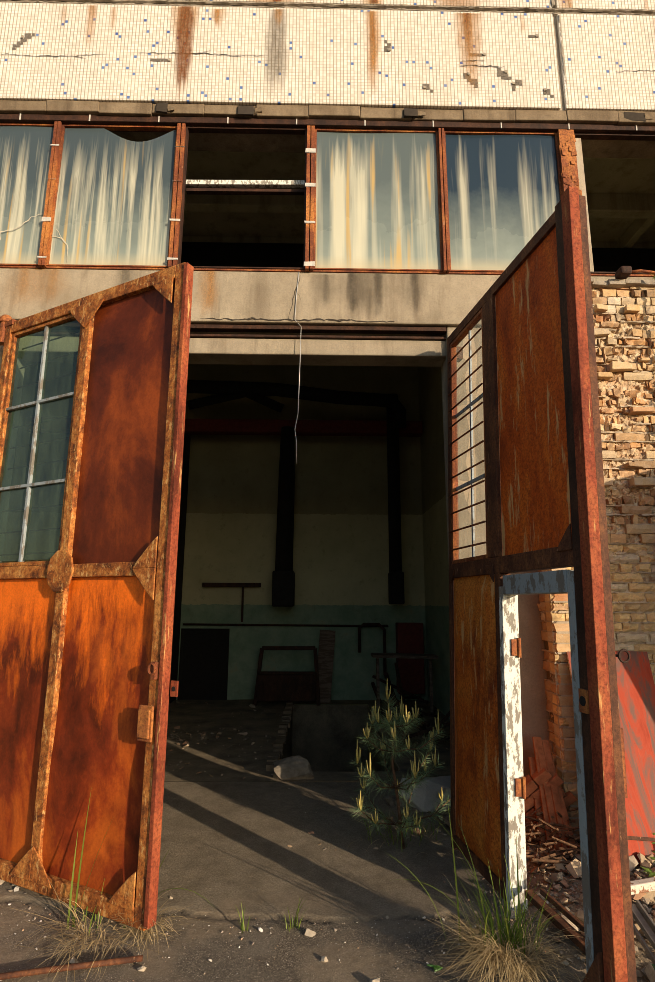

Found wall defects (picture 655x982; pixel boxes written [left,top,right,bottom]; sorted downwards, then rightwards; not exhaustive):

corrosion [177,6,193,89]
corrosion [369,0,378,67]
corrosion [459,13,476,56]
spalling [497,68,522,91]